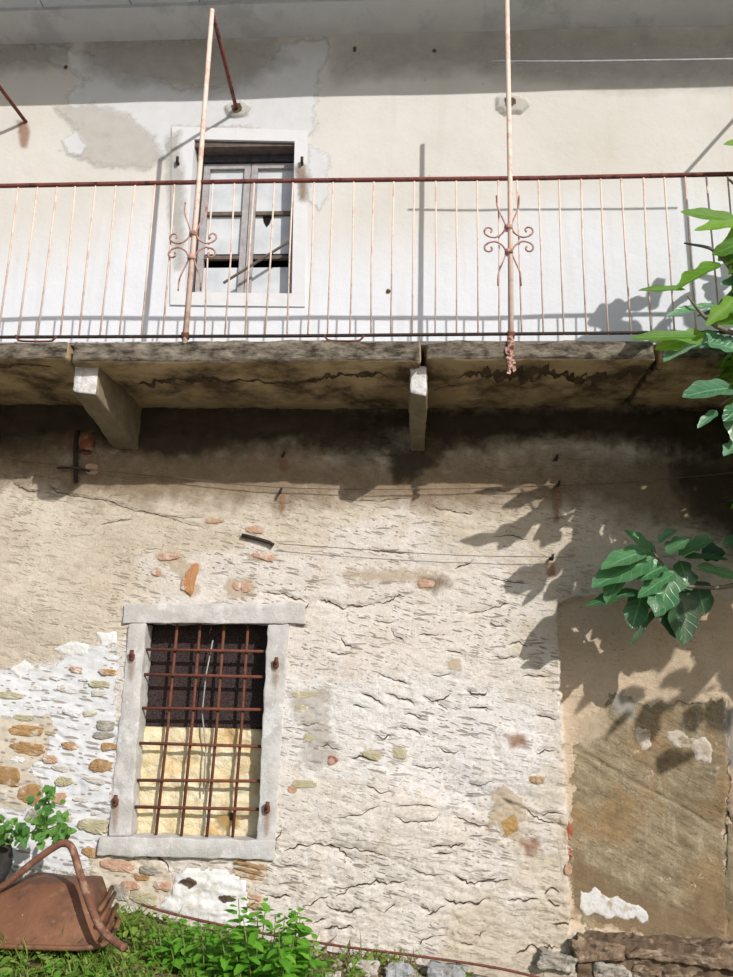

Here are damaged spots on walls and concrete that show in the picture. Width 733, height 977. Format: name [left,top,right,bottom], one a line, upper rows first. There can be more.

rust [19,122,28,146]
peeling [35,39,330,210]
spalling [497,94,530,114]
crack [233,371,386,388]
crack [14,483,203,528]
water stain [0,404,733,535]
peeling [0,631,174,915]
spalling [557,690,733,941]